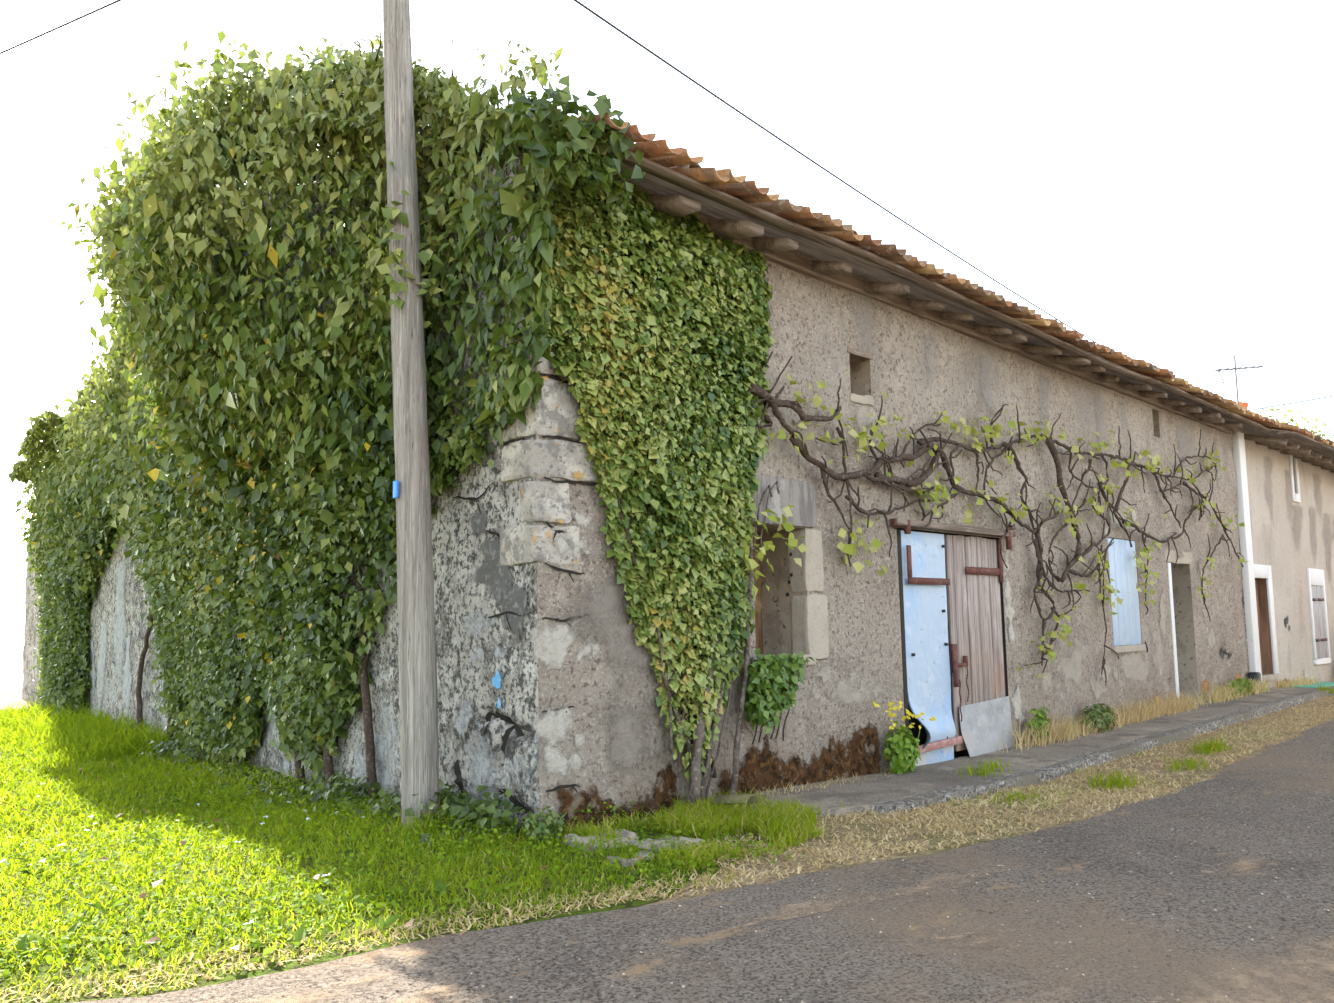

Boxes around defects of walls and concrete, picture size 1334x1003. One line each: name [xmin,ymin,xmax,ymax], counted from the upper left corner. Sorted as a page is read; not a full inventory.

crack [482,706,577,756]
crack [454,759,463,793]
crack [499,784,580,824]